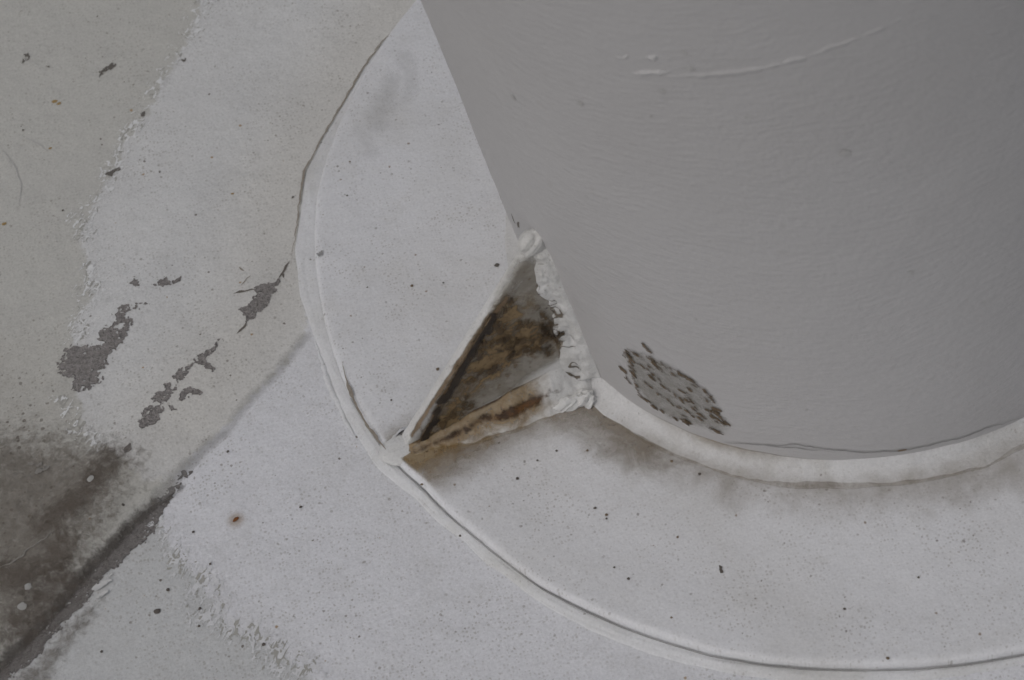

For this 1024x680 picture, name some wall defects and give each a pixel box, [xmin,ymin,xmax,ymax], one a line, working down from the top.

peeling [49,0,224,455]
peeling [238,278,281,322]